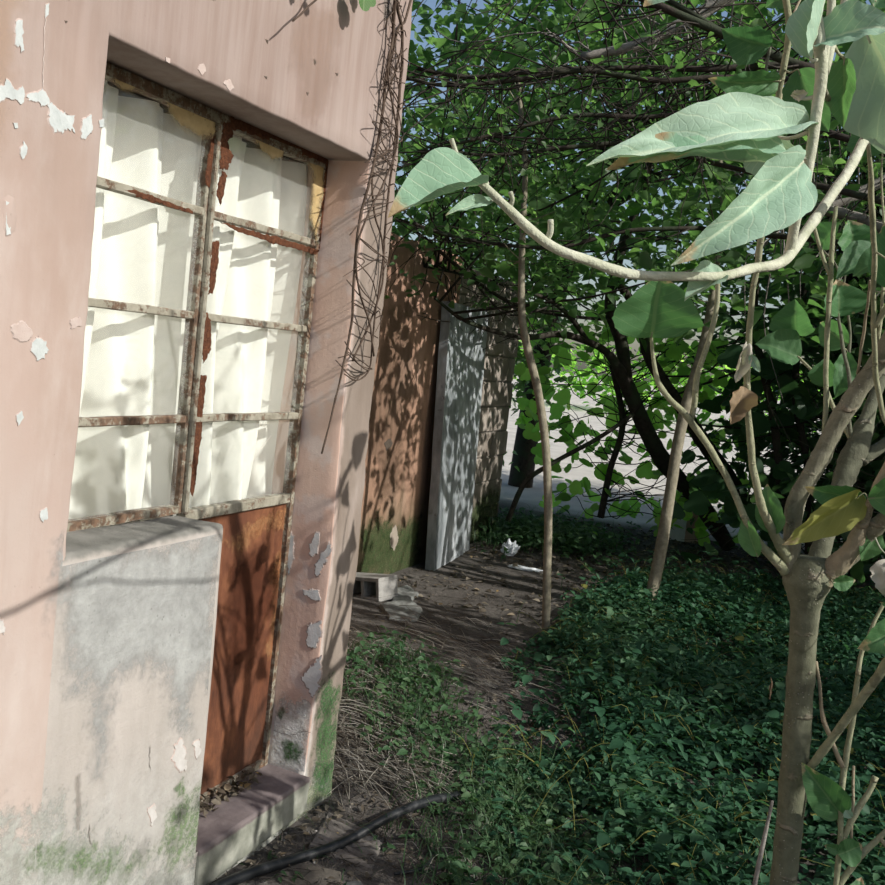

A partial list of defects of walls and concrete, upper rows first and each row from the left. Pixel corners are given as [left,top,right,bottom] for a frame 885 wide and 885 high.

peeling [0,78,104,140]
rust [127,189,193,214]
rust [205,116,329,254]
rust [208,241,220,295]
peeling [10,320,49,361]
rust [202,312,212,363]
rust [190,375,207,497]
peeling [309,531,333,577]
flaking render [58,535,219,767]
peeling [170,737,201,773]
water stain [282,741,303,763]
water stain [159,783,200,870]